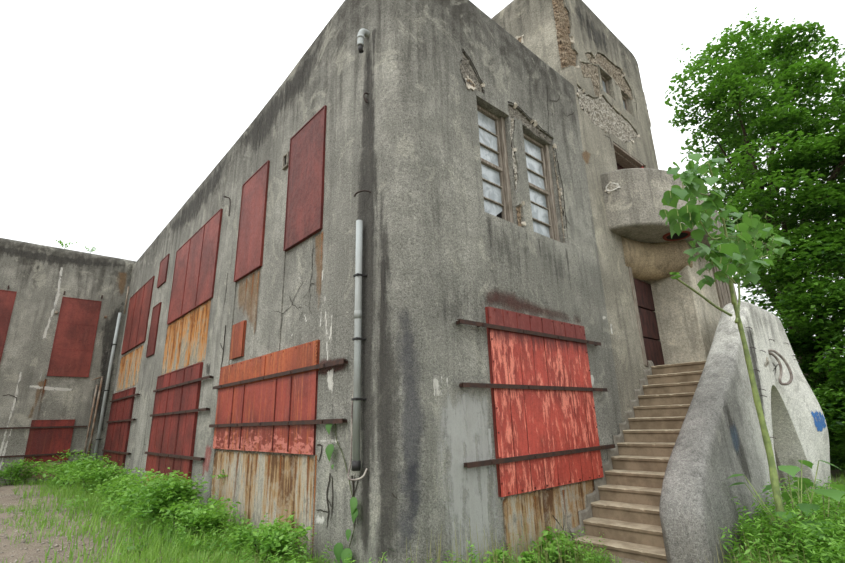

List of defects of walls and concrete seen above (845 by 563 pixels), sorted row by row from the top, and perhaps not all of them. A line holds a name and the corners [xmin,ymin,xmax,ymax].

spalling [552,0,640,143]
spalling [508,102,552,190]
leakage [0,247,121,269]
crack [273,275,313,335]
leakage [358,29,421,559]
rust [210,450,317,559]
rust [503,479,595,563]